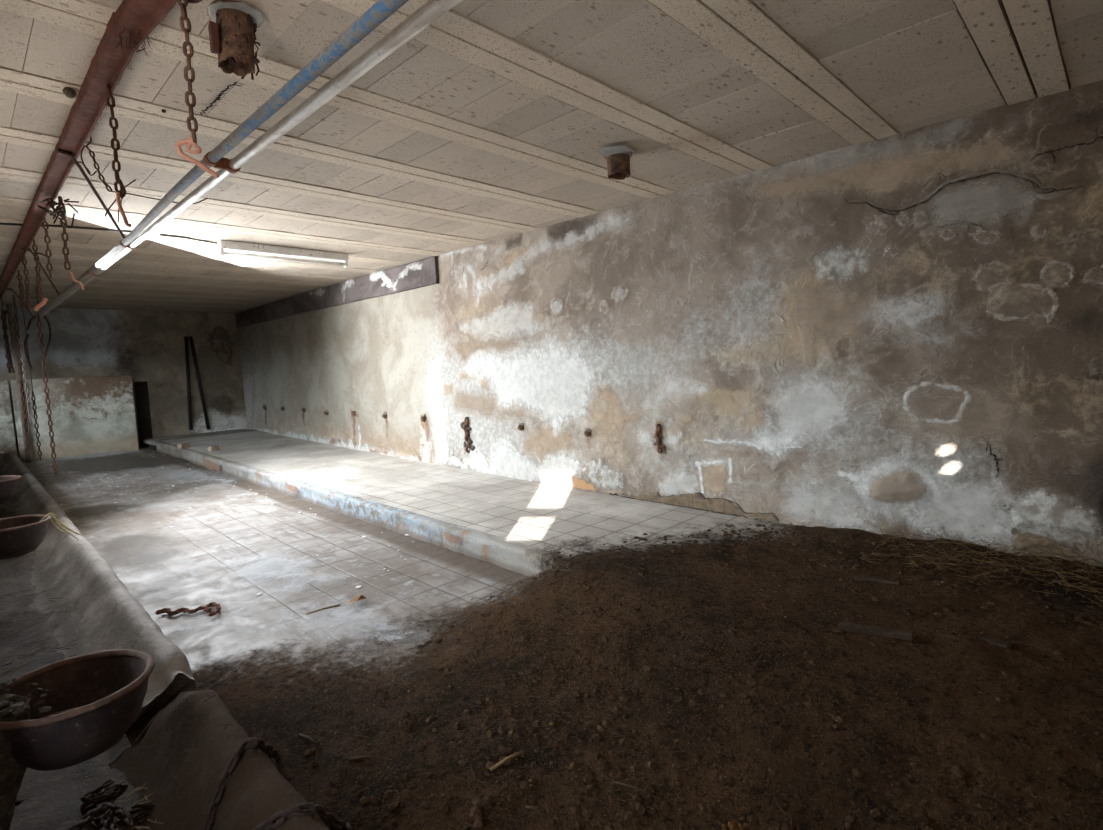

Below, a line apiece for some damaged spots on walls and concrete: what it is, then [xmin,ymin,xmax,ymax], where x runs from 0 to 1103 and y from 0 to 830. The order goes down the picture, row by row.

crack [844,127,1103,233]
leakage [548,217,594,244]
leakage [794,246,868,366]
leakage [257,324,642,489]
leakage [695,411,802,493]
leakage [838,457,908,494]
leakage [910,389,1014,439]
leakage [1010,469,1103,538]